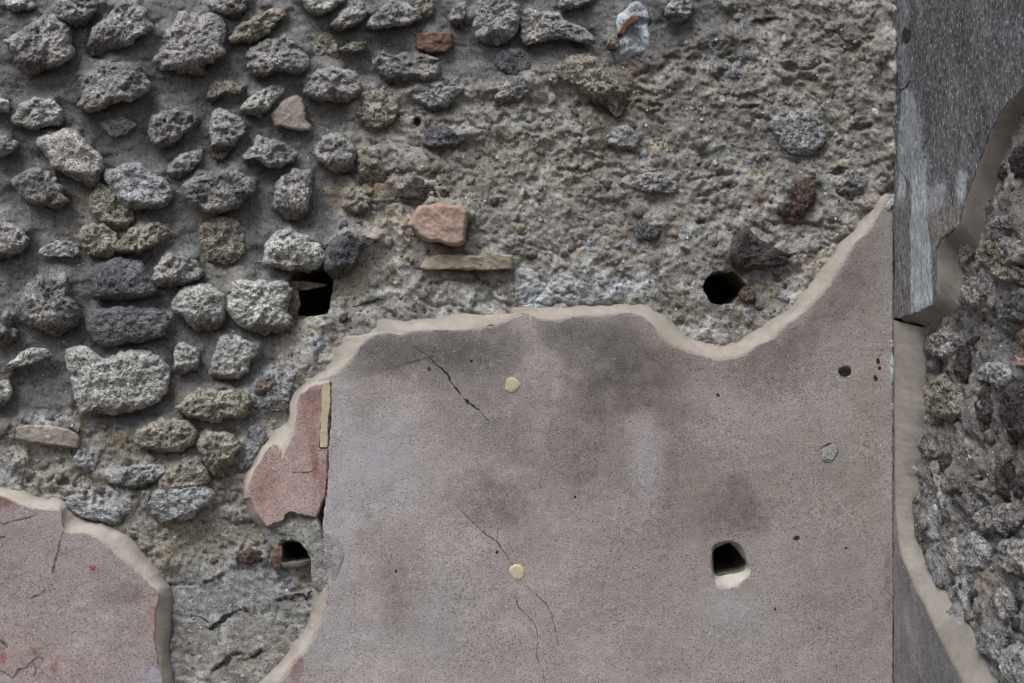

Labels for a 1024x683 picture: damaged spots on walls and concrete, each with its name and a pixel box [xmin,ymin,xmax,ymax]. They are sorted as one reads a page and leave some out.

spalling [617,15,639,36]
crack [412,345,489,421]
spalling [873,340,894,413]
spalling [911,113,1024,683]
spalling [262,500,344,590]
crack [456,504,513,565]
spalling [711,541,751,588]
crack [513,586,558,682]